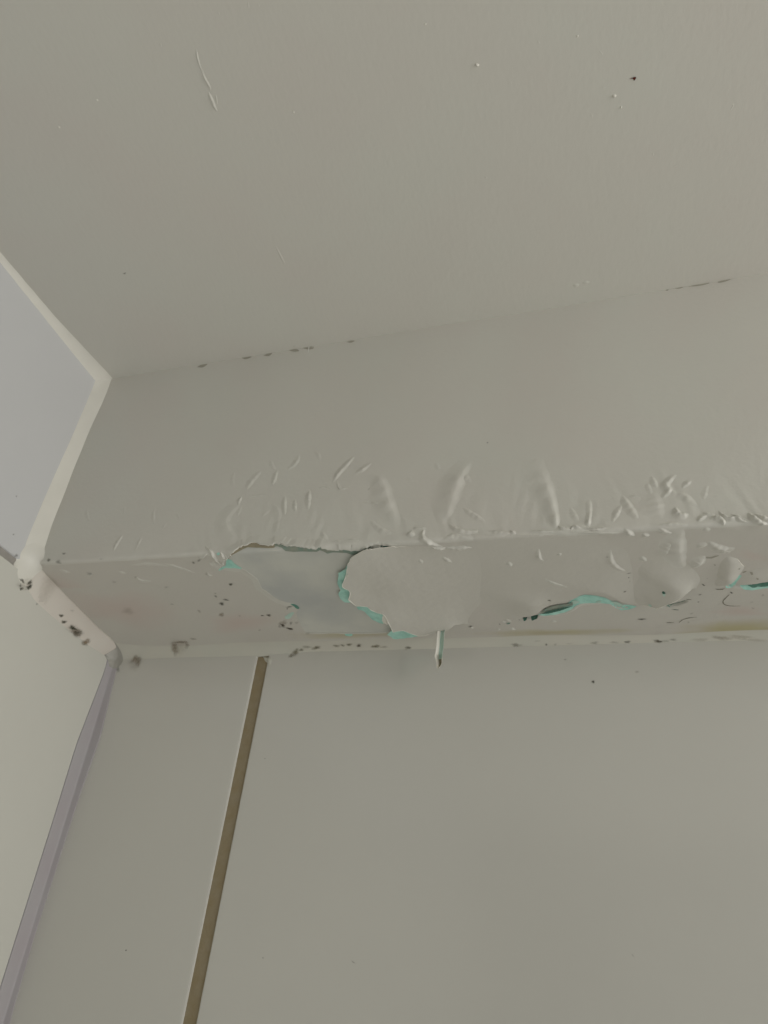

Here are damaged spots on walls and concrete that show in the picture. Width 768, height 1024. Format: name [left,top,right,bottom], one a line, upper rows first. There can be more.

leakage [41,559,391,653]
peeling [212,535,391,636]
leakage [411,592,768,645]
peeling [633,527,768,609]